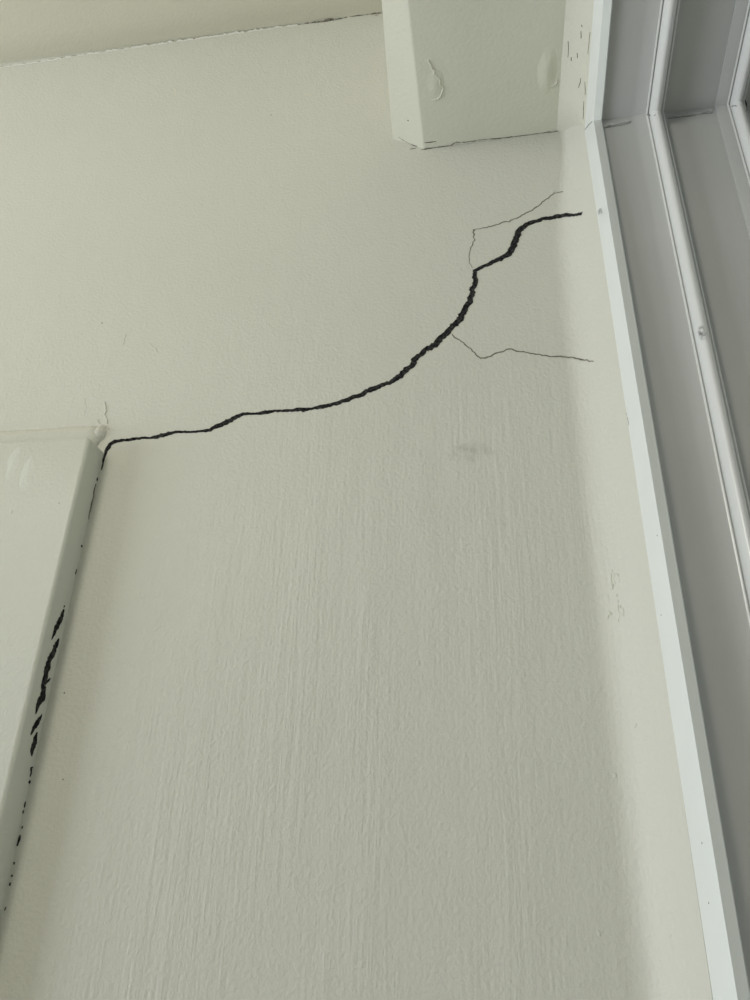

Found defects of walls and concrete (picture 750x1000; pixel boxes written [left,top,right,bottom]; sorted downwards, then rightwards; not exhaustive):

crack [88,190,594,519]
crack [4,605,65,911]